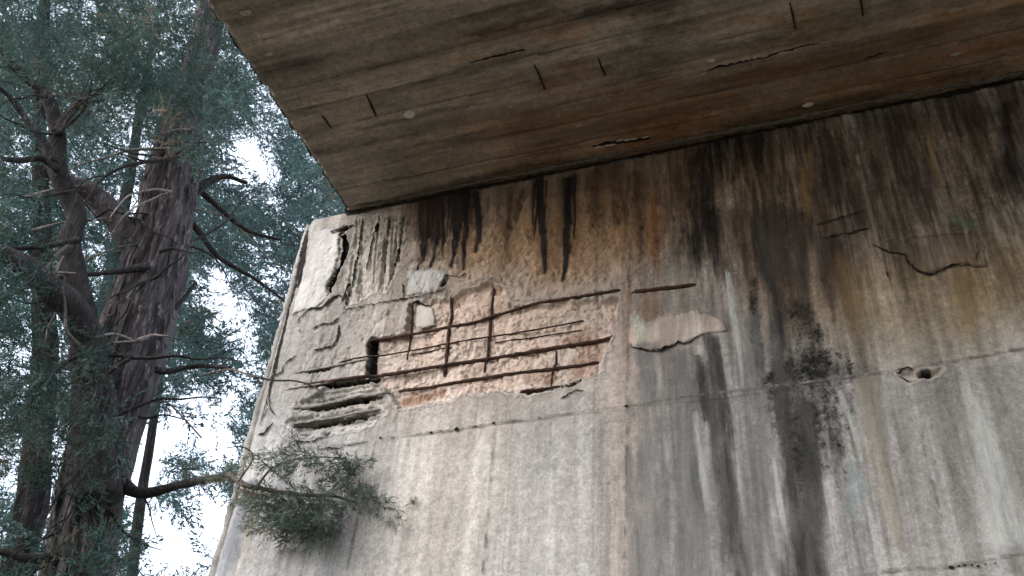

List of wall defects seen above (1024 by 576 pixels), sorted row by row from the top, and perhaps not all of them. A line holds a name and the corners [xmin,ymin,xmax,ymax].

crack [708,43,819,71]
damp [412,169,547,274]
spalling [282,189,688,439]
crack [256,77,1024,436]
rust [631,283,697,294]
damp [625,209,881,576]
spalling [893,363,947,386]